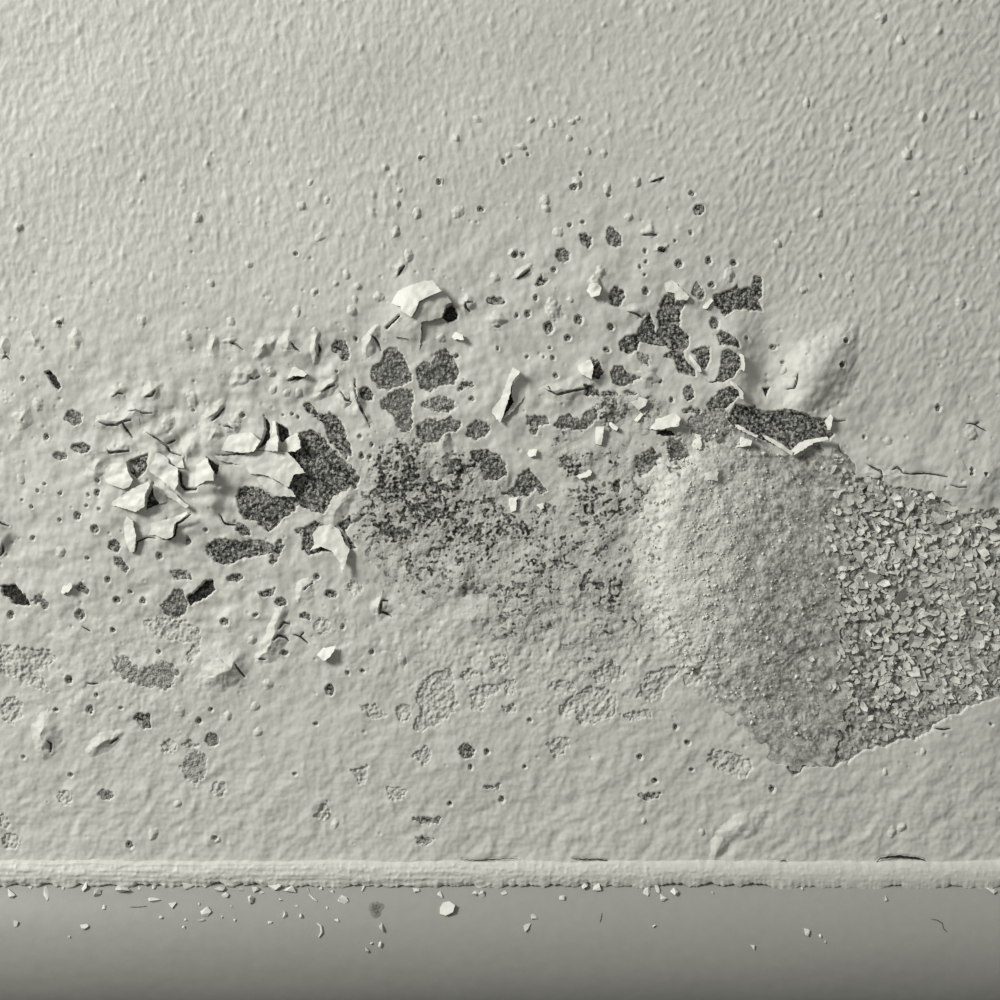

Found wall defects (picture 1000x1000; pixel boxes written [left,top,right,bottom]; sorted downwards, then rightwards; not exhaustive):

peeling [534,248,570,300]
peeling [46,371,61,390]
peeling [64,410,83,426]
peeling [54,442,91,460]
peeling [75,276,1000,769]
peeling [2,585,49,618]
peeling [61,582,89,595]
peeling [707,749,752,777]